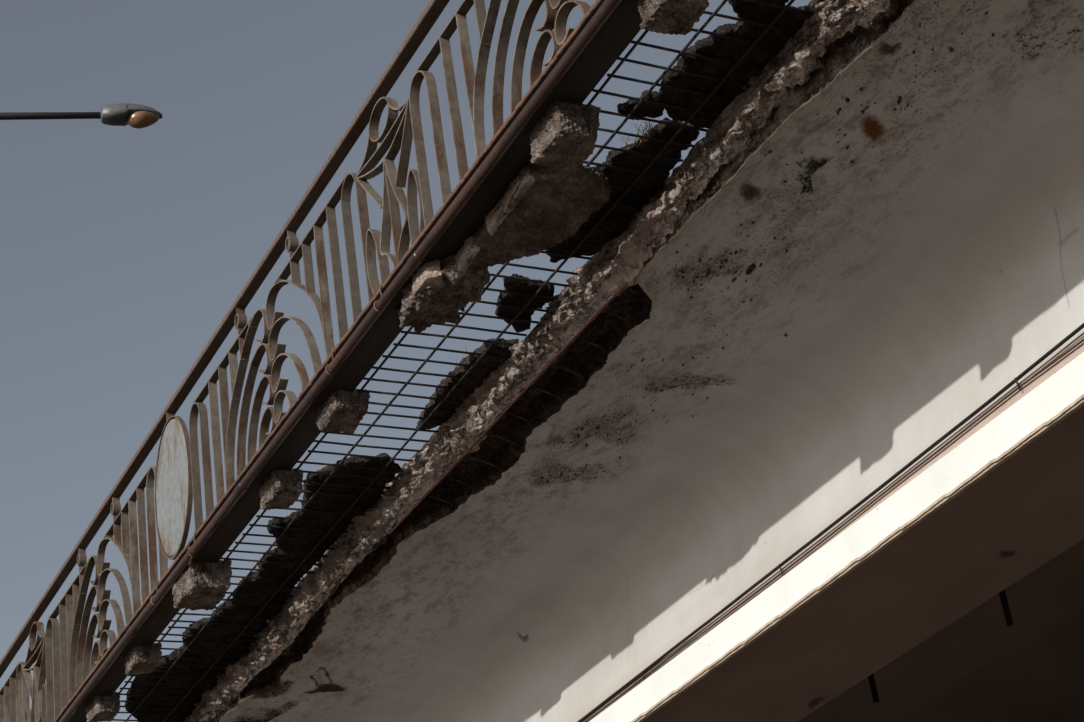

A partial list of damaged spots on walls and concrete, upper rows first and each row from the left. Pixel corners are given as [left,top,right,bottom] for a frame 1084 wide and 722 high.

rust [861,116,883,140]
water stain [656,244,748,299]
spalling [113,0,912,722]
water stain [532,357,731,492]